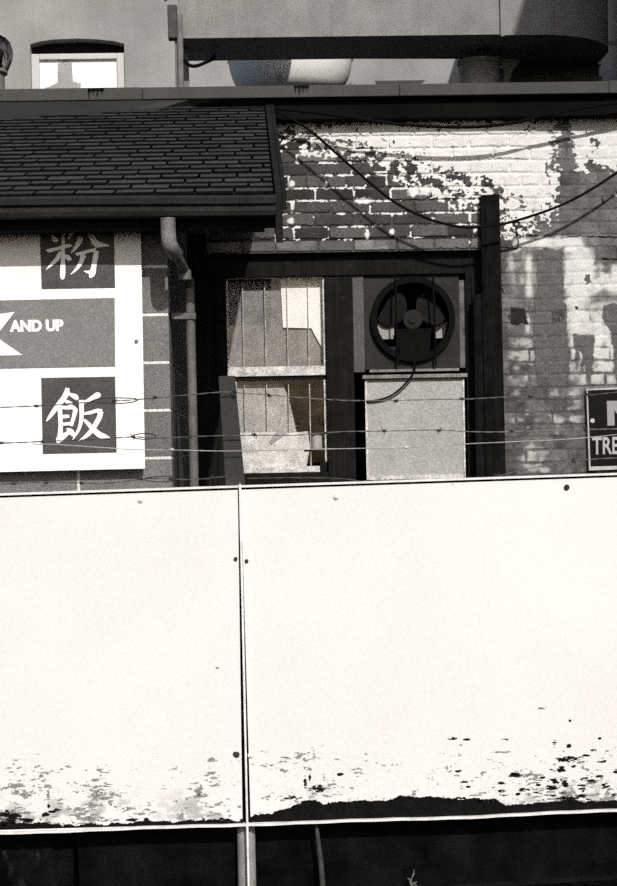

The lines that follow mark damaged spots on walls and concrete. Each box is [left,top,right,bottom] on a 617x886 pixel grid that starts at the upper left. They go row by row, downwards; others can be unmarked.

peeling [275,118,617,397]
damp [508,249,595,404]
damp [602,303,617,387]
peeling [523,445,548,472]
peeling [0,737,617,830]